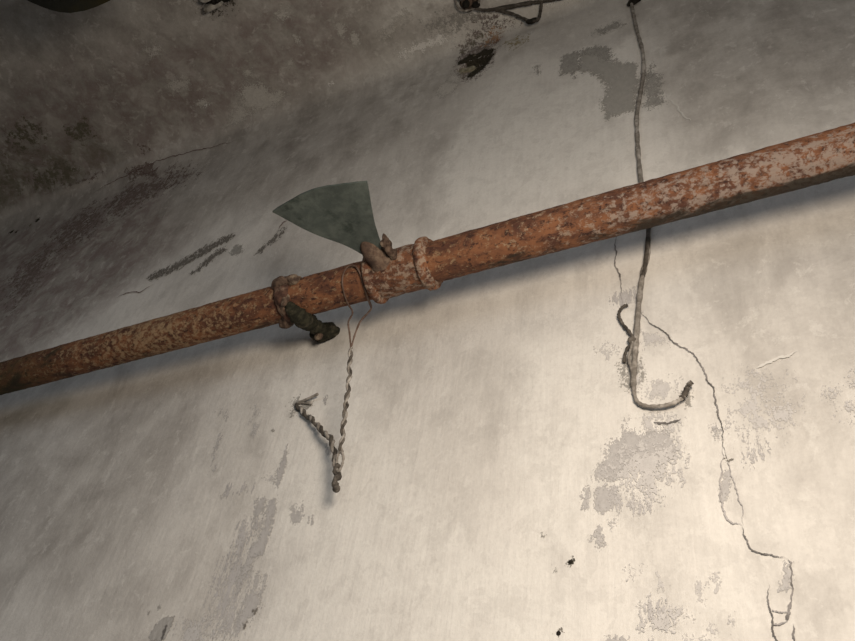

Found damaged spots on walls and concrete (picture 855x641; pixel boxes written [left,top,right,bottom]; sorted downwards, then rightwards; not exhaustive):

peeling [558,21,667,121]
peeling [120,234,243,296]
peeling [255,221,287,255]
peeling [579,409,690,548]
crack [642,314,795,641]
spalling [148,606,174,641]